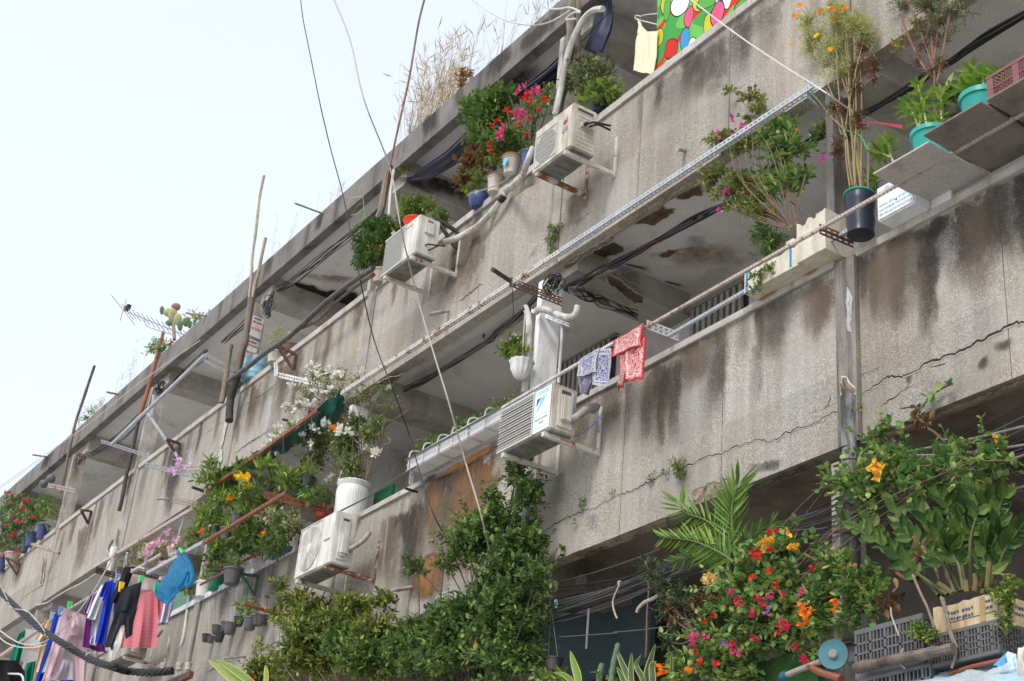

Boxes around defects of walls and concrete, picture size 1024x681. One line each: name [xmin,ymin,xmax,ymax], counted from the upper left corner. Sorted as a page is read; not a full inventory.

peeling [562,172,705,269]
water stain [857,173,1024,326]
water stain [574,403,589,443]
water stain [603,385,620,422]
water stain [641,332,726,434]
crack [541,395,837,534]
water stain [755,301,786,348]
water stain [804,279,835,331]
crack [860,320,1024,409]
rust [410,445,499,596]